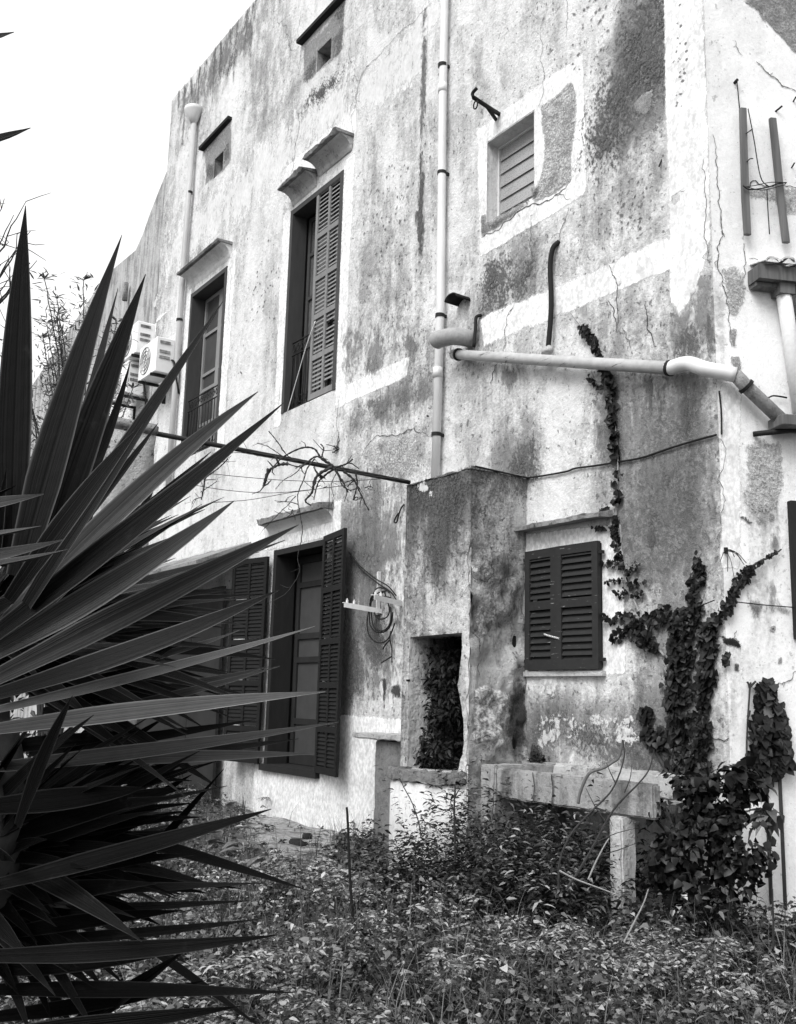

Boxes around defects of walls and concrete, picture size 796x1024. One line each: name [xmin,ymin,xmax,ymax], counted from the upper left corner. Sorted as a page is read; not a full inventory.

leakage [415,8,427,255]
leakage [575,0,666,184]
crack [608,265,656,348]
crack [671,136,758,344]
leakage [343,431,541,707]
peeling [538,713,639,751]